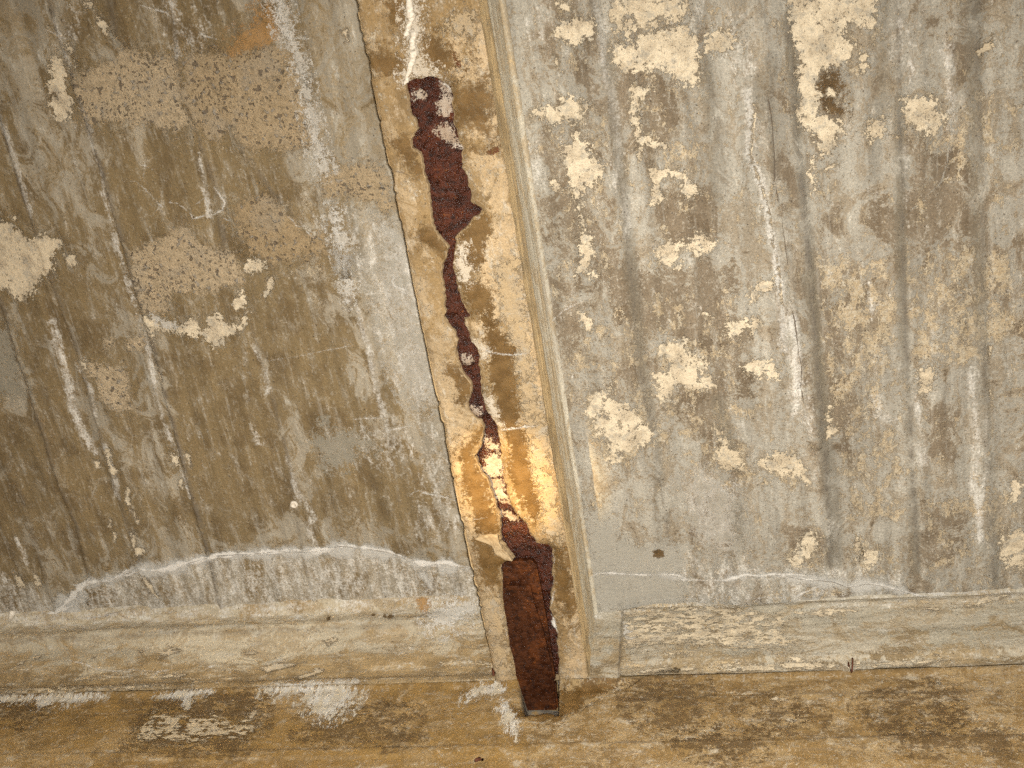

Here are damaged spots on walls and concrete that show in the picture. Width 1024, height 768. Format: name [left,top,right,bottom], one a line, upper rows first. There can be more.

peeling [528,0,740,282]
damp [815,65,854,122]
peeling [782,0,951,196]
peeling [0,213,79,304]
spalling [403,76,565,710]
peeling [583,336,722,466]
damp [667,461,756,566]